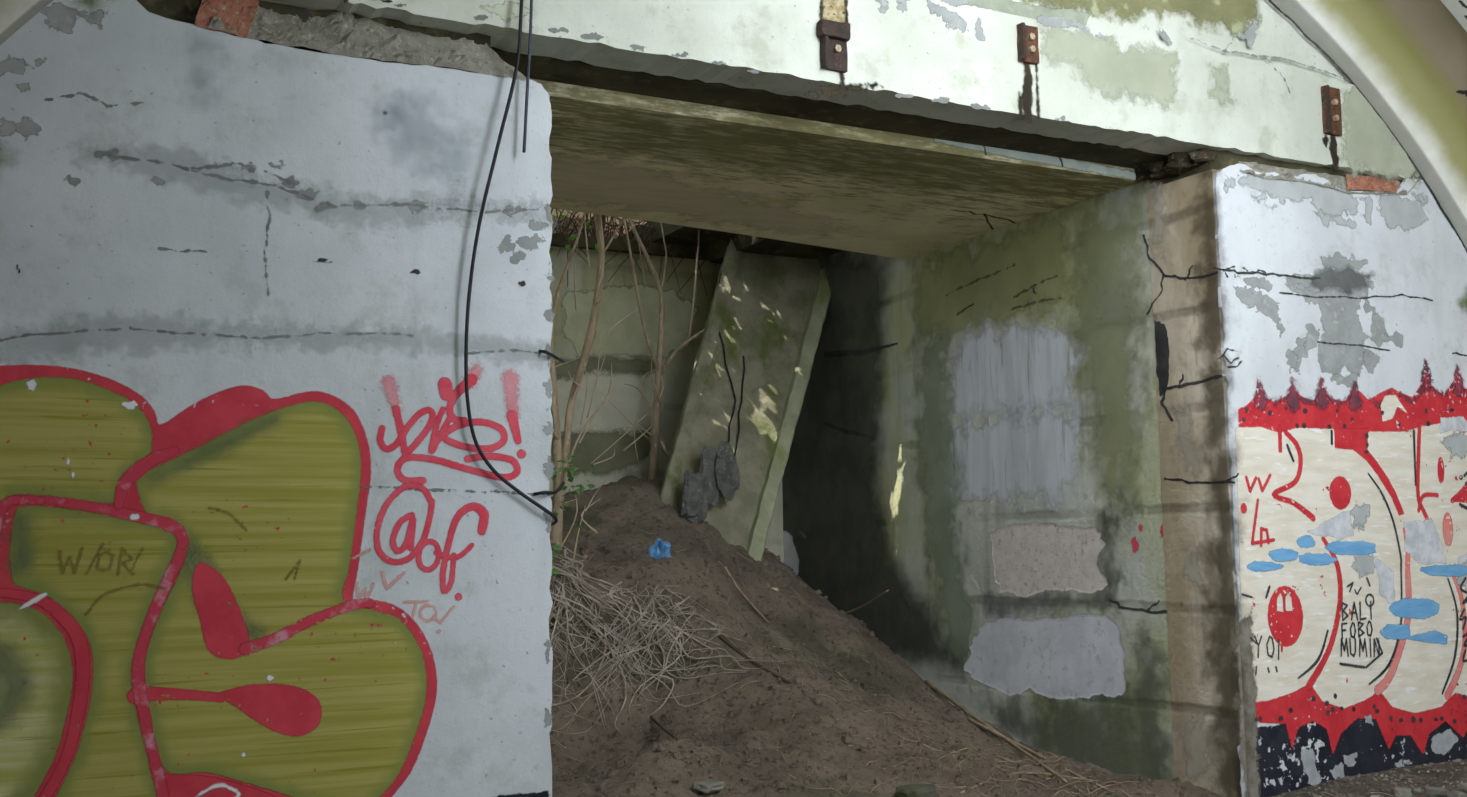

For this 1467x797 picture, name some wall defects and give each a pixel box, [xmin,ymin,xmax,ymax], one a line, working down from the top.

peeling [41,2,108,34]
peeling [875,0,907,13]
peeling [926,0,985,41]
crack [45,92,143,107]
corrosion [1018,62,1040,122]
corrosion [1322,135,1339,170]
peeling [1224,161,1428,231]
crack [65,148,538,296]
crack [0,327,414,342]
peeling [1234,252,1403,388]
crack [1162,348,1242,390]
damp [983,163,1249,797]